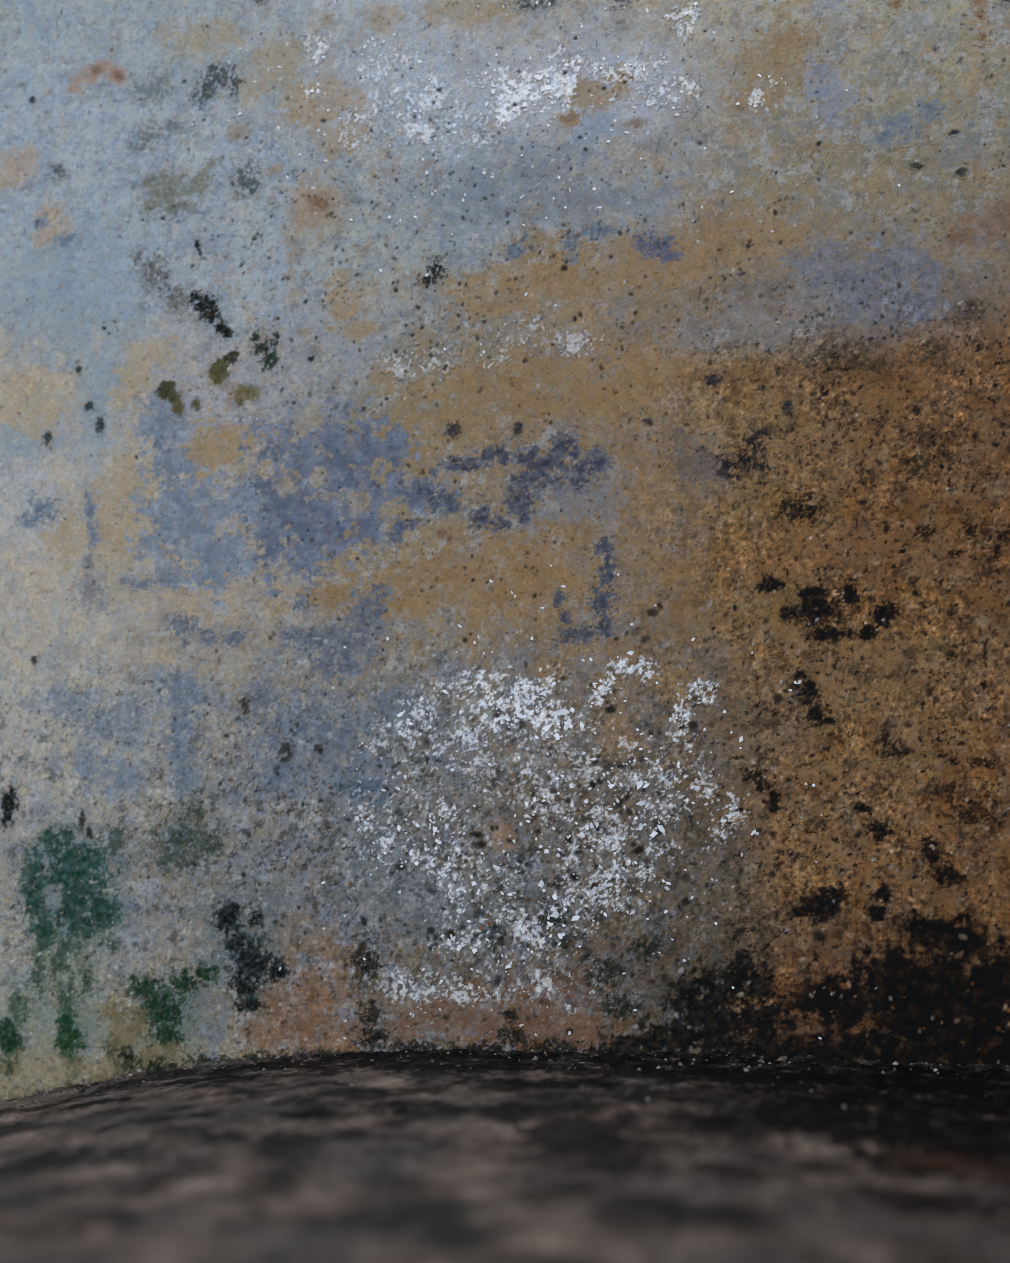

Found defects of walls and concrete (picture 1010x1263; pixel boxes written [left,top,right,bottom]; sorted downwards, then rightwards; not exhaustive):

leakage [123,0,849,195]
leakage [225,157,264,203]
mould [767,485,837,529]
corrosion [680,511,1006,591]
mould [908,516,1010,565]
leakage [753,572,906,648]
leakage [28,653,40,669]
leakage [237,691,259,727]
leakage [788,667,837,731]
leakage [273,526,786,1027]
leakage [867,730,918,766]
leakage [0,751,1010,1263]